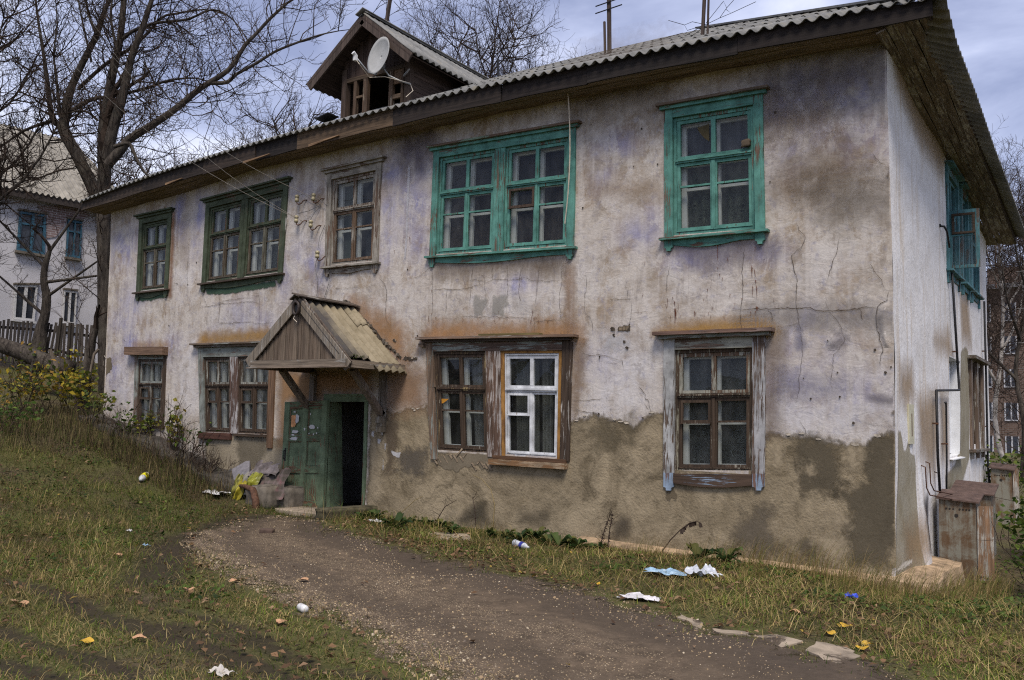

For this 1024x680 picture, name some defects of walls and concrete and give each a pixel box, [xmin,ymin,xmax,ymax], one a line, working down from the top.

leakage [425,322,572,337]
crack [740,225,888,397]
peeling [366,405,925,576]
leakage [795,434,895,568]